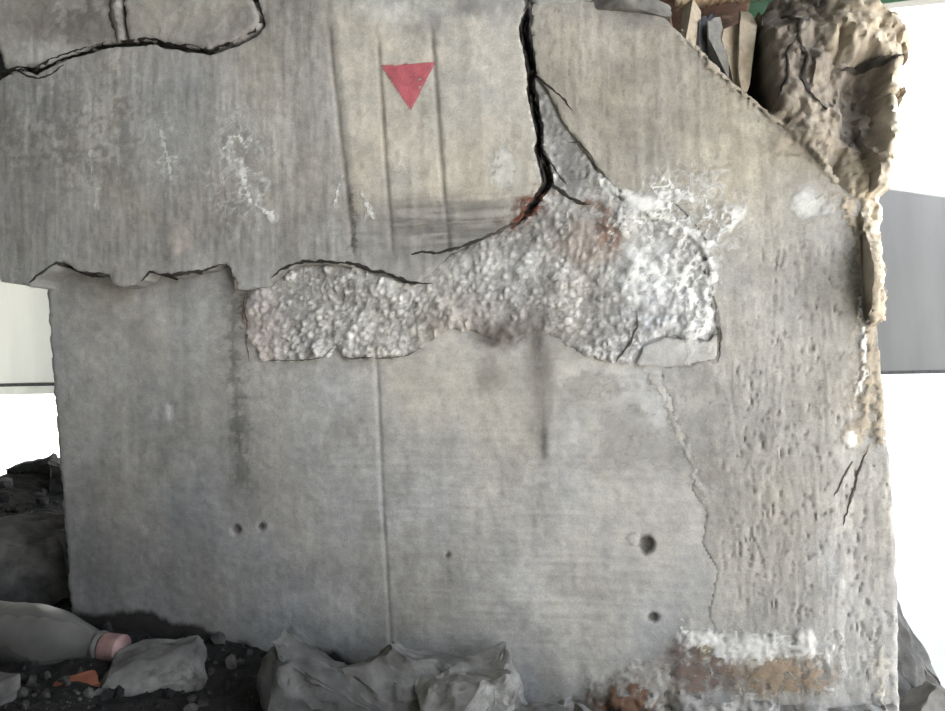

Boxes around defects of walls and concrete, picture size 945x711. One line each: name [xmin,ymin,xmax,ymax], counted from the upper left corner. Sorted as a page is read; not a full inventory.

crack [0,0,263,79]
peeling [590,0,770,95]
crack [410,0,590,255]
damp [216,127,276,222]
crack [29,261,105,283]
crack [141,264,224,281]
crack [271,259,433,285]
spalling [243,80,717,497]
crack [671,200,723,361]
crack [834,445,870,525]
rust [589,683,657,711]
rust [660,644,836,700]